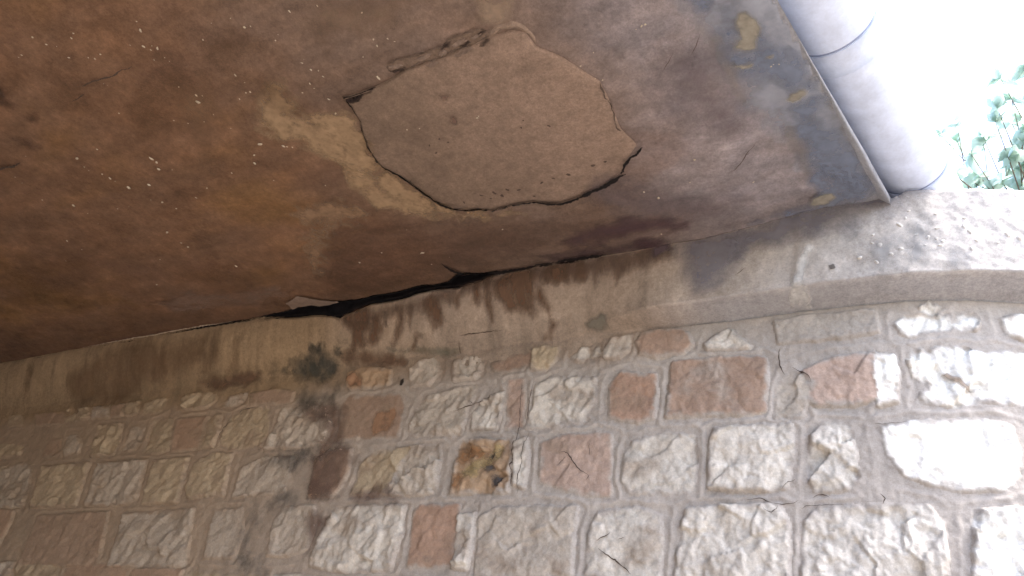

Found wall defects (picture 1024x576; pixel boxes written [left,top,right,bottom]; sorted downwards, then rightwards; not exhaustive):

peeling [286,296,339,309]
water stain [298,244,669,377]
water stain [688,197,895,304]
crack [455,380,534,492]